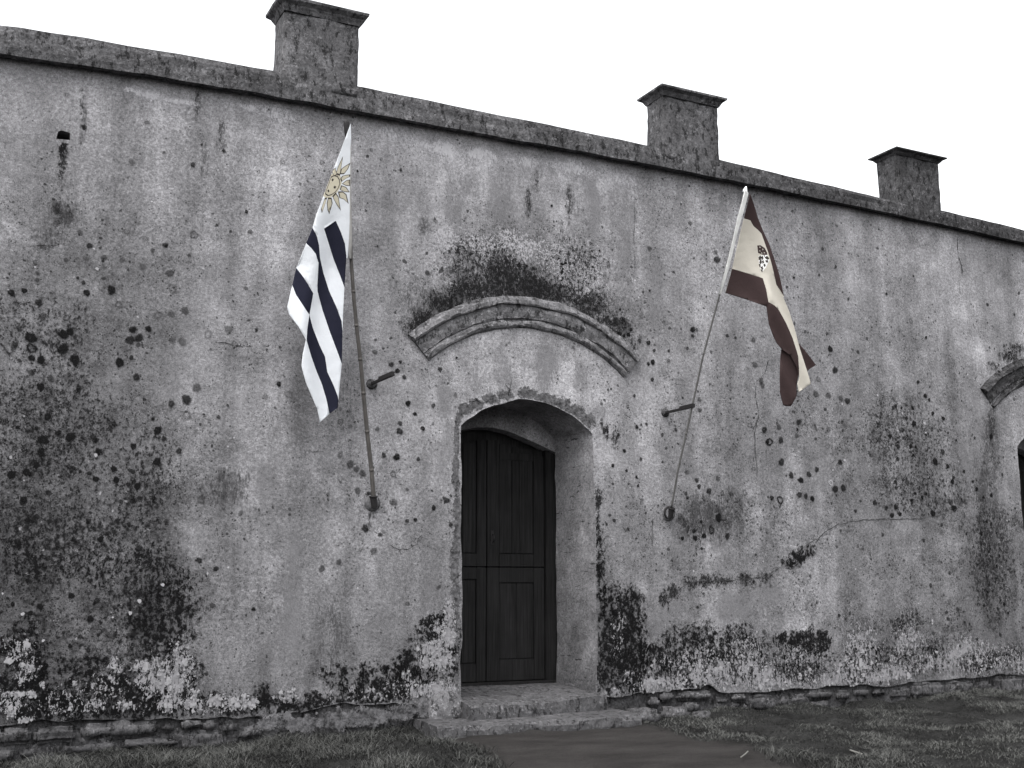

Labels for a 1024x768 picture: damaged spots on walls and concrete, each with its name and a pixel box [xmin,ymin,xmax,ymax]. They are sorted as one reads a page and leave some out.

damp [58,141,68,186]
damp [367,123,640,350]
damp [0,292,462,722]
damp [595,486,1024,697]
crack [665,501,961,598]
damp [861,395,1016,621]